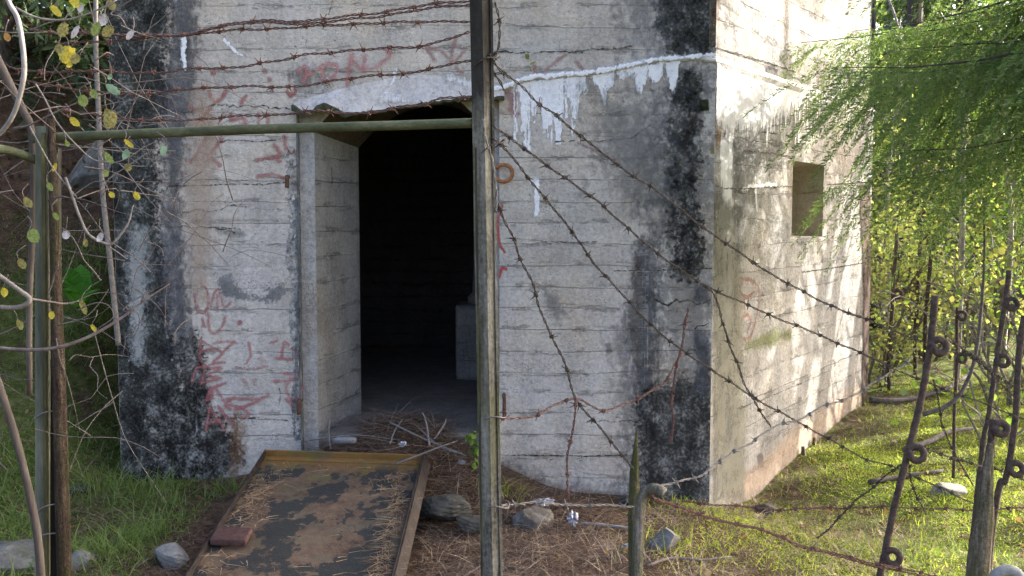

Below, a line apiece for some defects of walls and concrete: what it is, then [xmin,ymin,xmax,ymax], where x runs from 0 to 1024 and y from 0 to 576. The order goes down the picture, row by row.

water stain [108,0,248,481]
water stain [494,0,828,507]